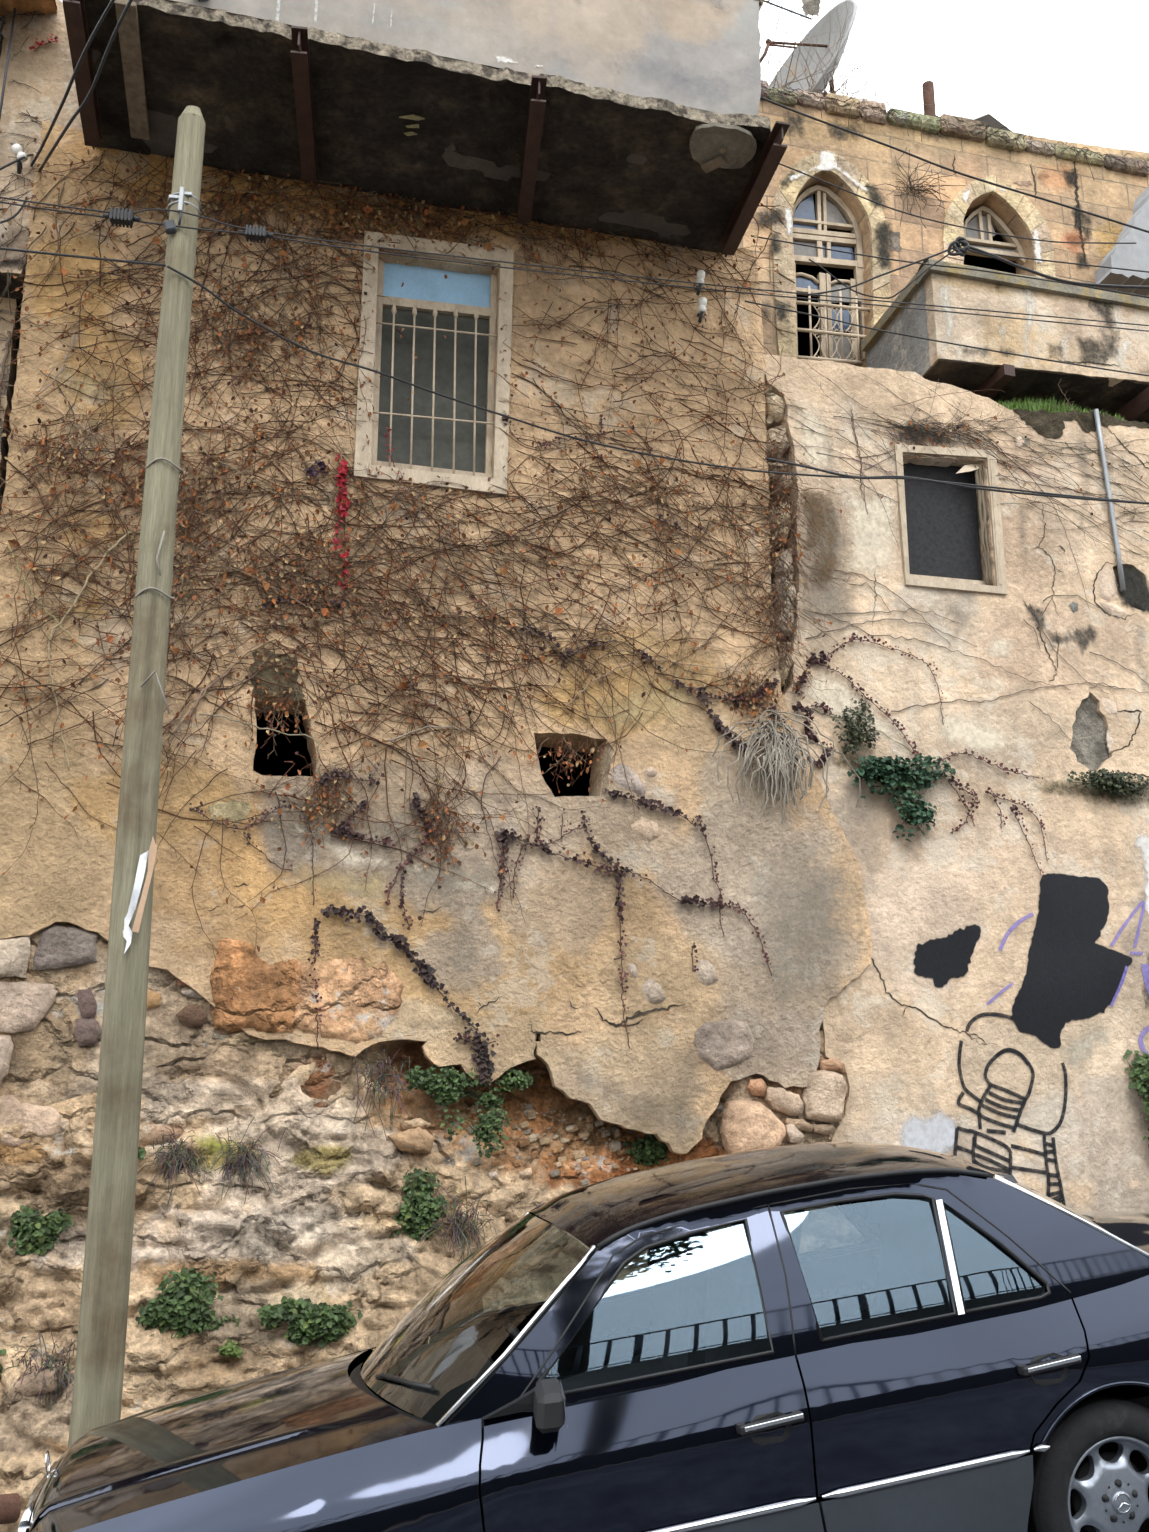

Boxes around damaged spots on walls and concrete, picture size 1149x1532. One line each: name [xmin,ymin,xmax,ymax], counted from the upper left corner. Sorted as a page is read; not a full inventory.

damp [1115,566,1149,612]
flaking render [1070,695,1118,771]